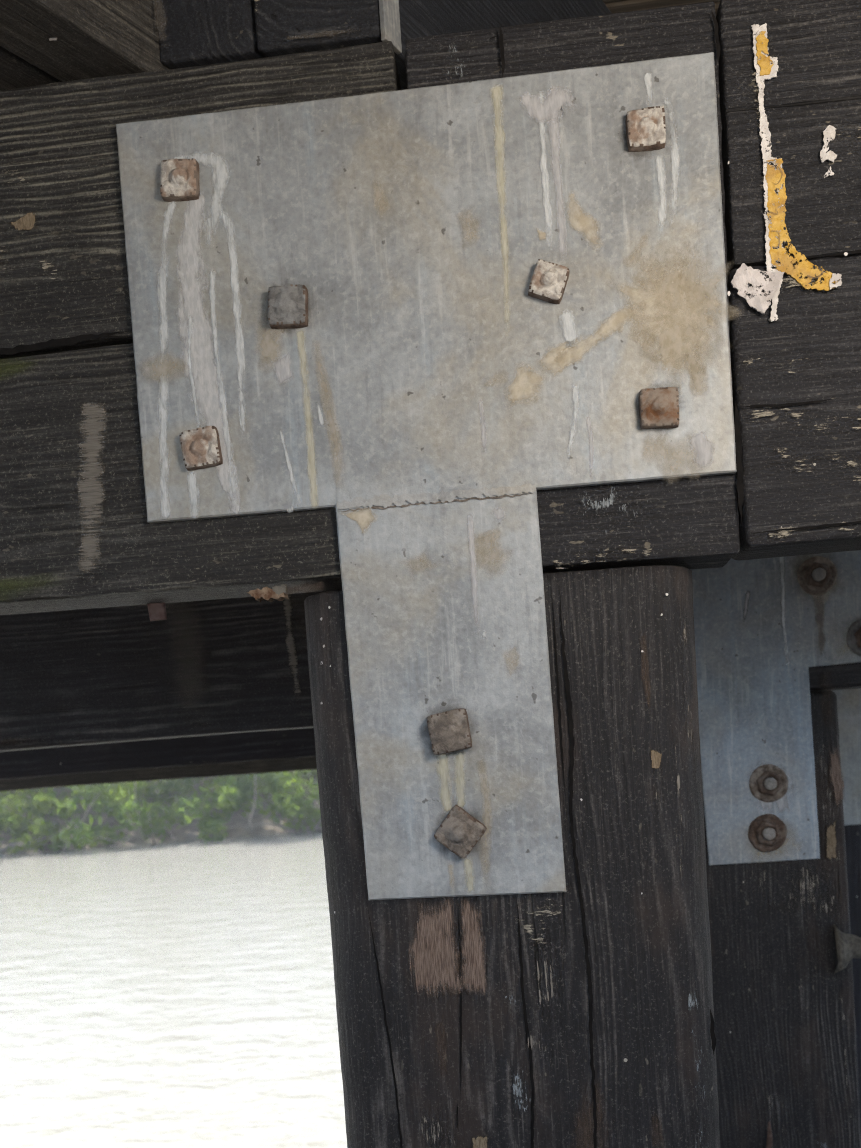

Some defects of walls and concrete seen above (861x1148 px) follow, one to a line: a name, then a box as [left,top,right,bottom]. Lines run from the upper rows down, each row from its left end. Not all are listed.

damp [522,90,570,251]
peeling [727,23,842,322]
damp [158,153,245,518]
peeling [750,408,803,425]
crack [367,904,403,1148]
crack [455,913,463,1127]